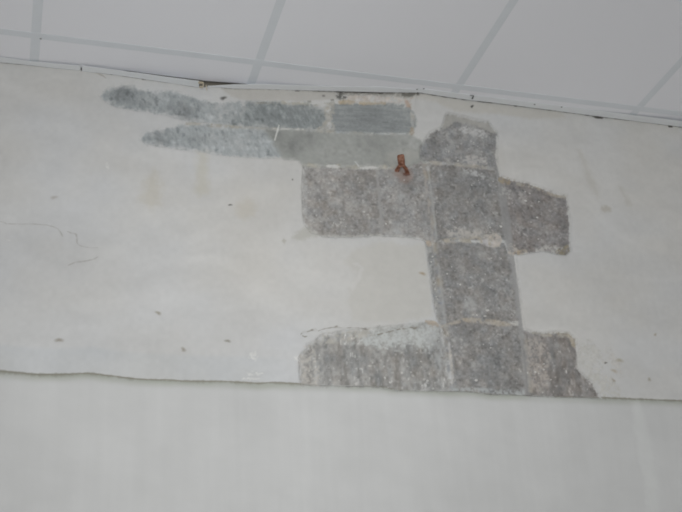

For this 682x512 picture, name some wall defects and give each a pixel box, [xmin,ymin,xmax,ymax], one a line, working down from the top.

spalling [100,83,600,399]